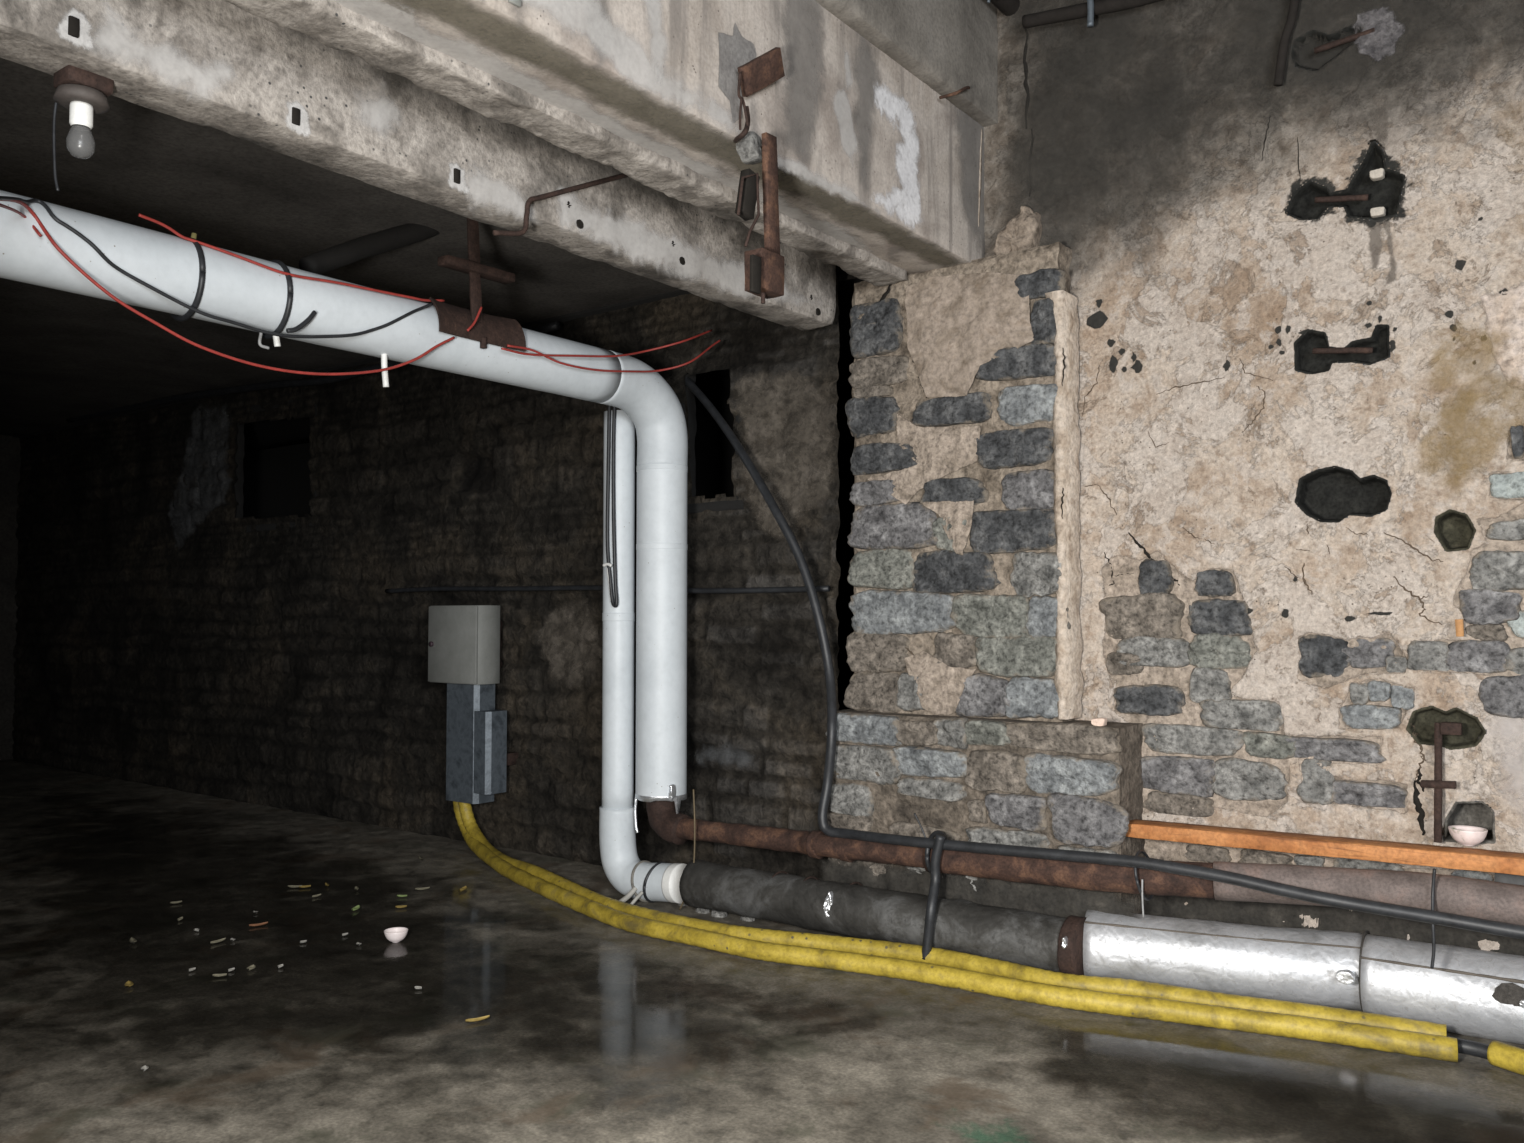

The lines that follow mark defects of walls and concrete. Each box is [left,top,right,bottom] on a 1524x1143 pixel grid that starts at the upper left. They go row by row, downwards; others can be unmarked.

damp [1016,0,1524,247]
damp [1369,220,1396,283]
peeling [905,272,1034,397]
spalling [1086,299,1143,373]
spalling [1269,325,1307,355]
spalling [1365,301,1397,352]
peeling [1480,284,1524,390]
flaking render [1091,425,1524,817]
spalling [1443,801,1496,844]